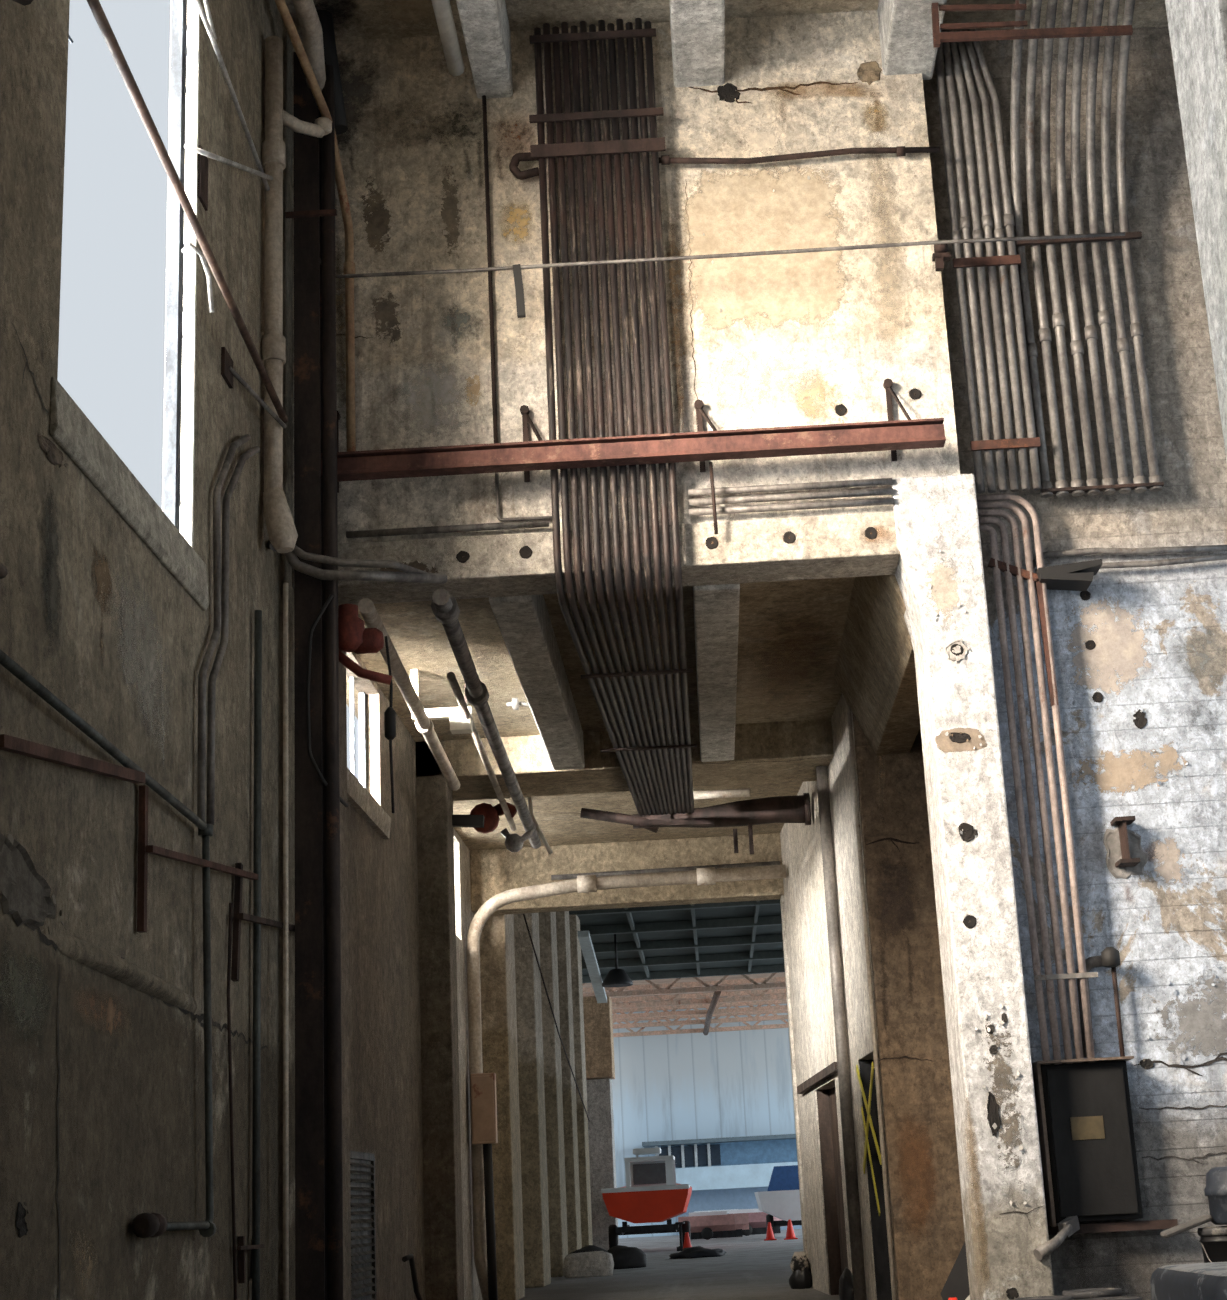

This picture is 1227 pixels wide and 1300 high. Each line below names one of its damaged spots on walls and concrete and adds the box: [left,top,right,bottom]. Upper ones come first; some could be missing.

peeling [1065,594,1155,710]
spalling [1133,709,1147,729]
peeling [1072,742,1196,800]
spalling [0,833,64,934]
peeling [975,999,1027,1205]
crack [1134,1052,1227,1110]